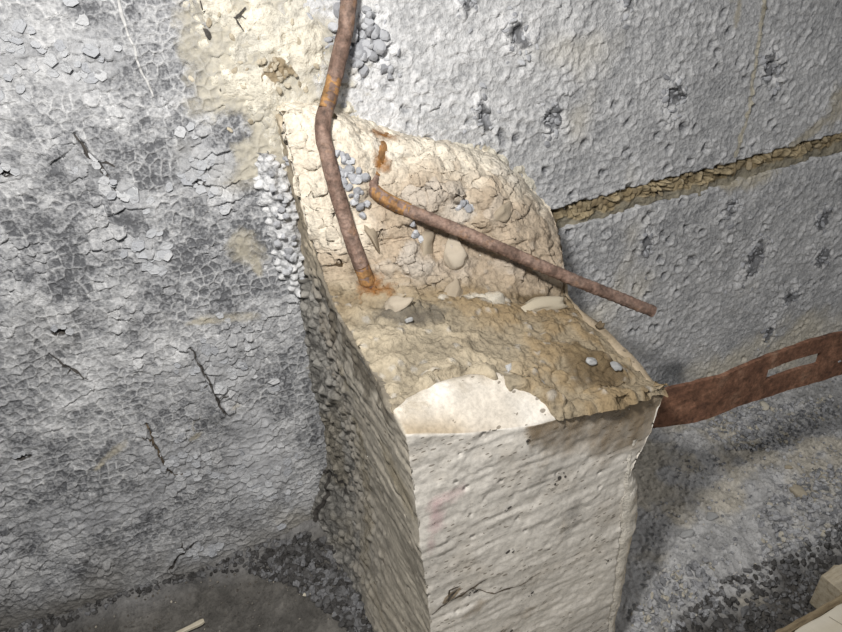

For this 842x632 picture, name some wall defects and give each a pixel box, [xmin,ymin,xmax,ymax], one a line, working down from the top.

spalling [659,74,688,125]
crack [74,134,116,191]
spalling [256,0,669,421]
crack [48,353,88,380]
crack [189,347,228,415]
peeling [200,338,258,394]
crack [142,423,186,476]
crack [313,469,348,523]
crack [432,572,541,615]